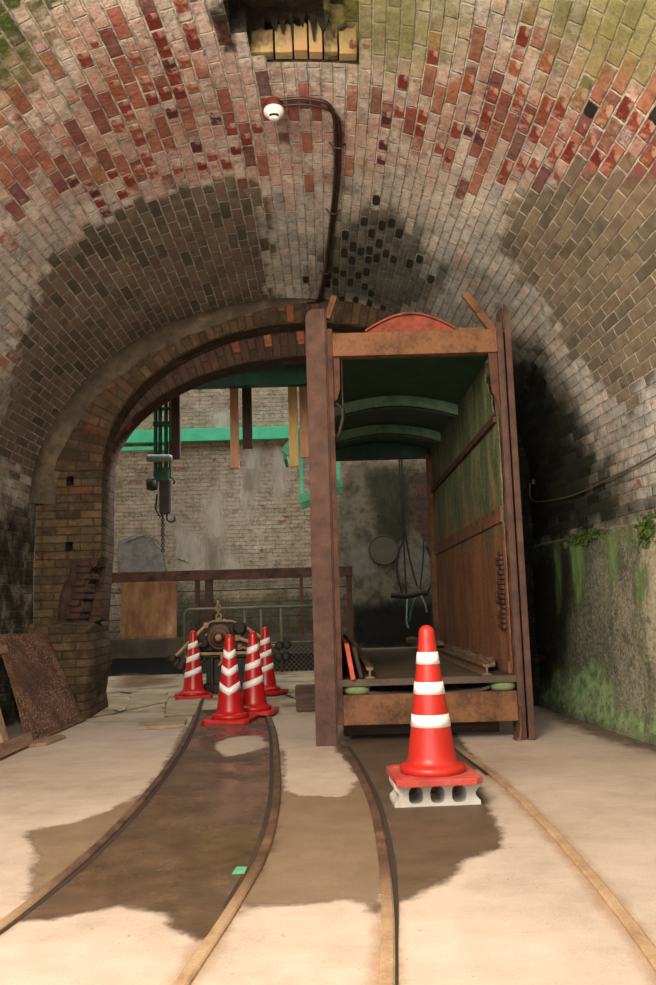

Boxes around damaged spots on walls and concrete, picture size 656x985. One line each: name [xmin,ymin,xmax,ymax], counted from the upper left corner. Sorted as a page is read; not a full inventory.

peeling [77,40,99,68]
peeling [138,0,201,119]
spalling [209,0,370,65]
water stain [512,347,655,706]
crack [90,691,132,718]
water stain [20,709,502,939]